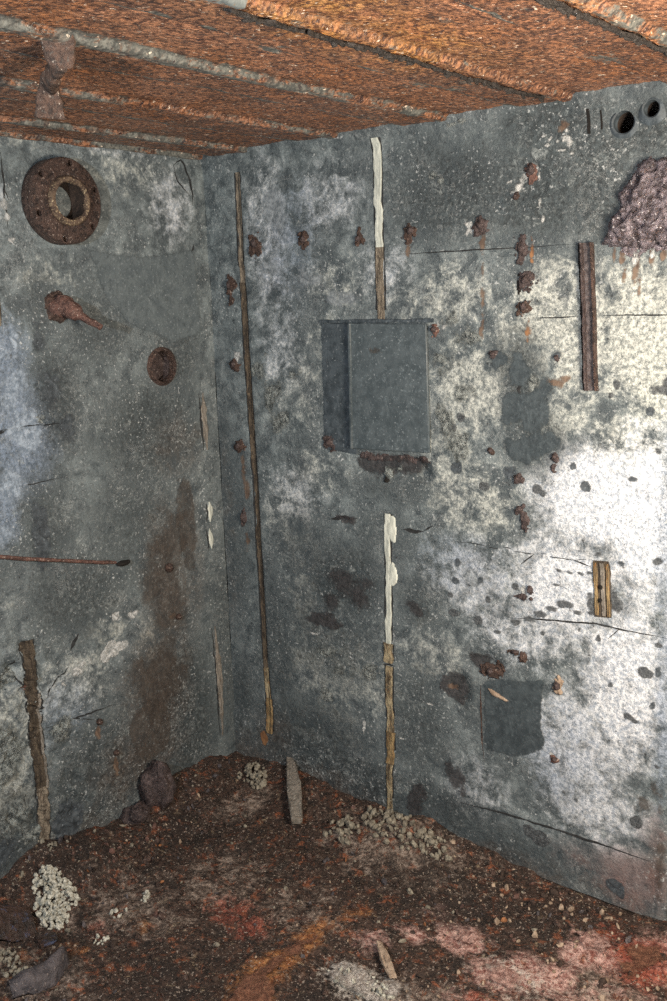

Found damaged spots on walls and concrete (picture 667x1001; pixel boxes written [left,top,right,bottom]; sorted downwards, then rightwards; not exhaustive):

peeling [205,0,269,26]
rust [612,244,667,295]
crack [0,422,60,434]